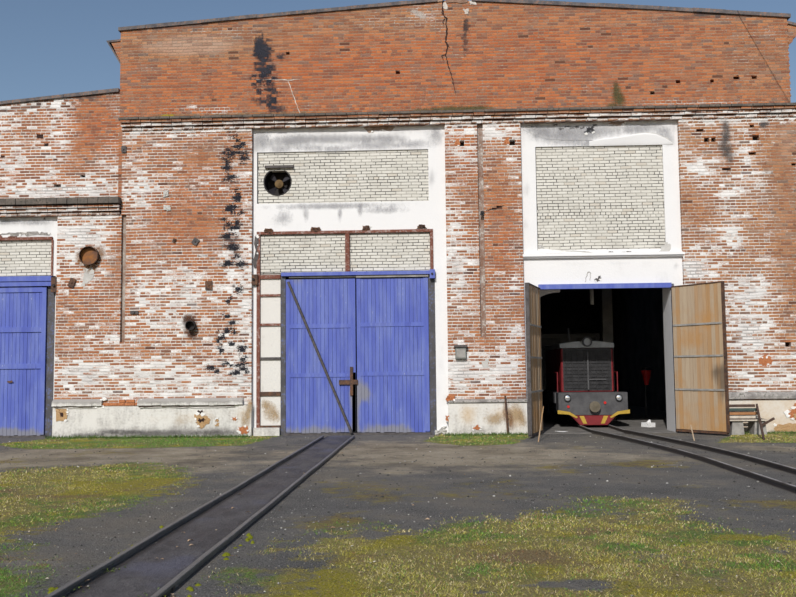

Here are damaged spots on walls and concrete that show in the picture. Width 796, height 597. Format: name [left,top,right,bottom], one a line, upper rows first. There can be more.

water stain [251,39,284,112]
crack [441,1,456,93]
spalling [773,403,796,432]